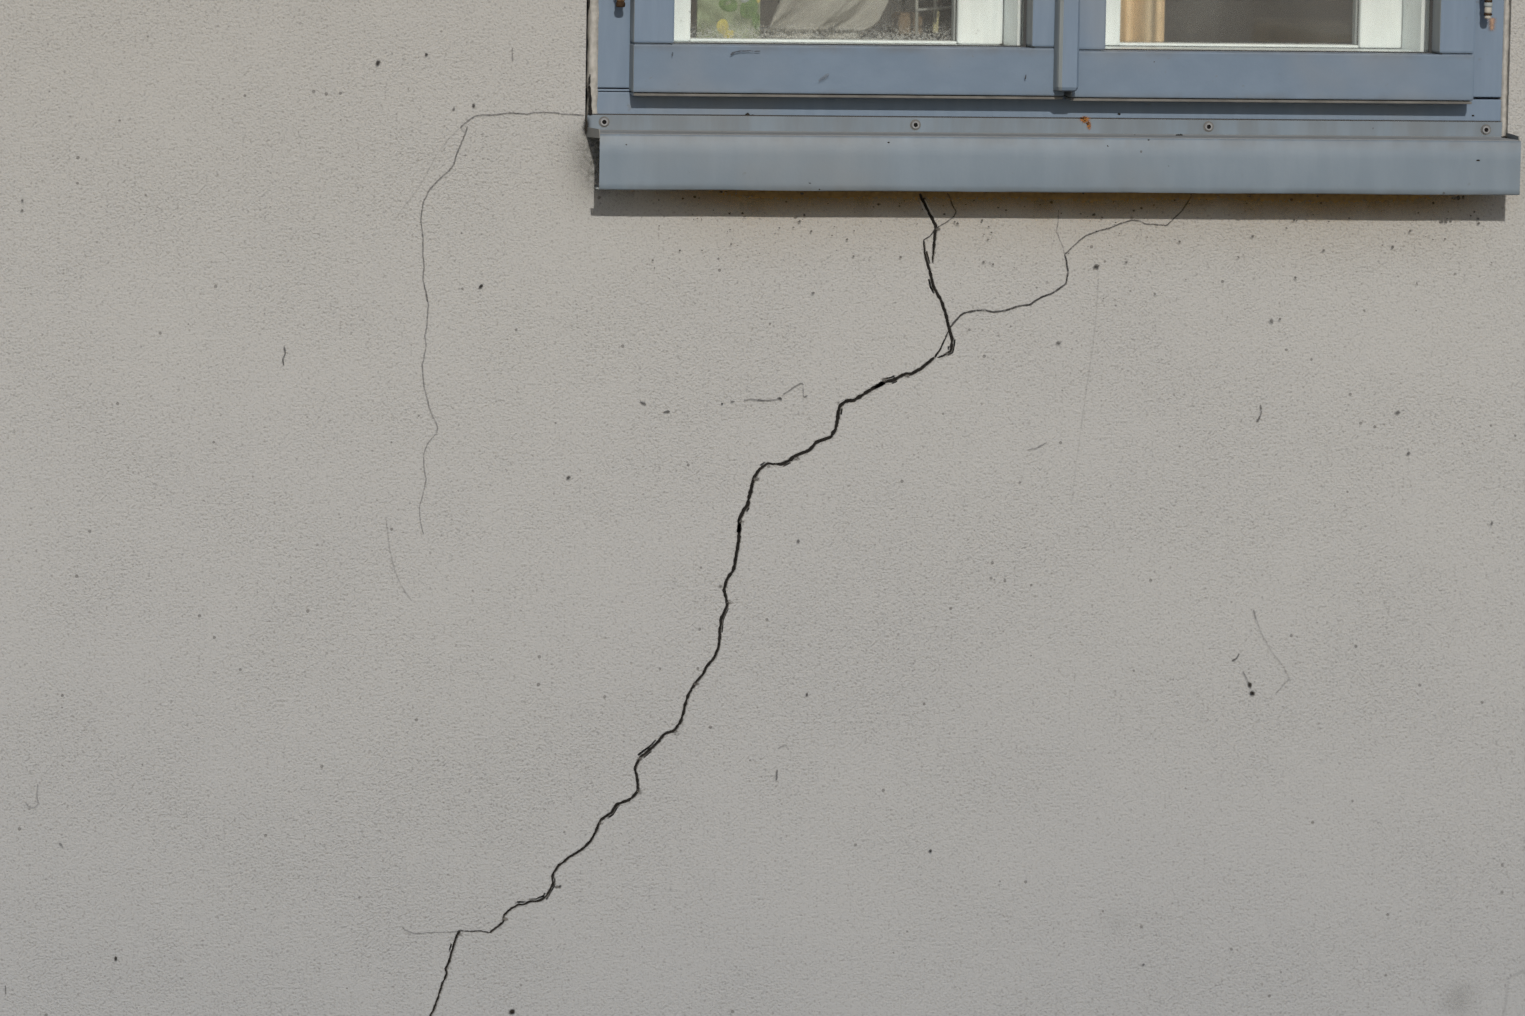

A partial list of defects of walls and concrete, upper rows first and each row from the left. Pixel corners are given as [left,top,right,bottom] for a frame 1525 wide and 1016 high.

crack [428,193,1191,1016]